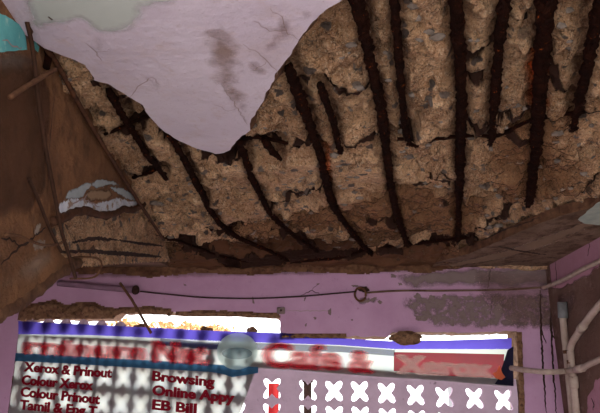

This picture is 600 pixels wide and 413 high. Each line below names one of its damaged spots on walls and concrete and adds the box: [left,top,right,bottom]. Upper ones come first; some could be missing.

crack [398,117,449,144]
crack [467,105,530,147]
spalling [0,0,600,324]
crack [270,178,332,211]
crack [1,227,49,265]
crack [63,197,557,413]